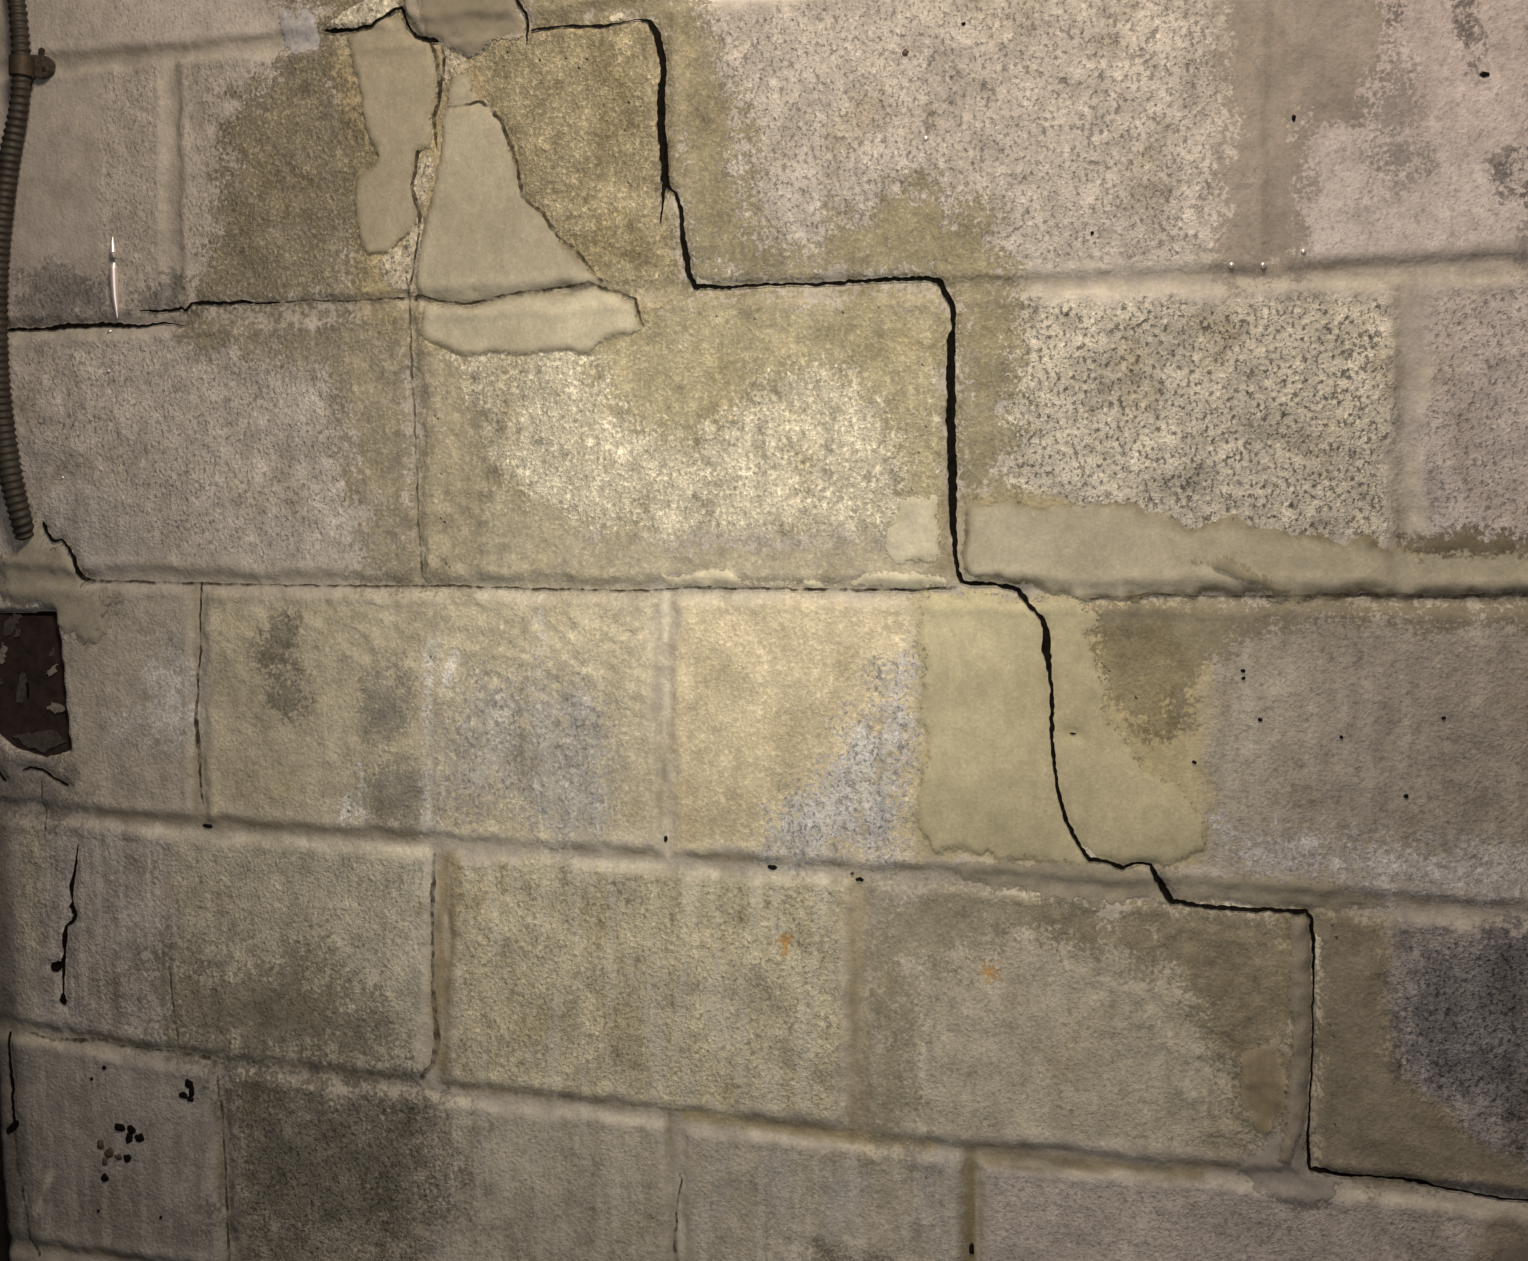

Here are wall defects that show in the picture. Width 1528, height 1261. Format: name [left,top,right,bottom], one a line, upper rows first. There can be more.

crack [8,6,644,443]
peeling [278,0,399,55]
spalling [377,154,436,297]
spalling [438,44,472,98]
leakage [1202,0,1432,288]
leakage [1454,0,1484,75]
leakage [1490,146,1528,276]
leakage [175,0,1037,858]
crack [42,521,736,799]
crack [516,0,1528,1201]
crack [0,766,230,1256]
spalling [1315,934,1323,970]